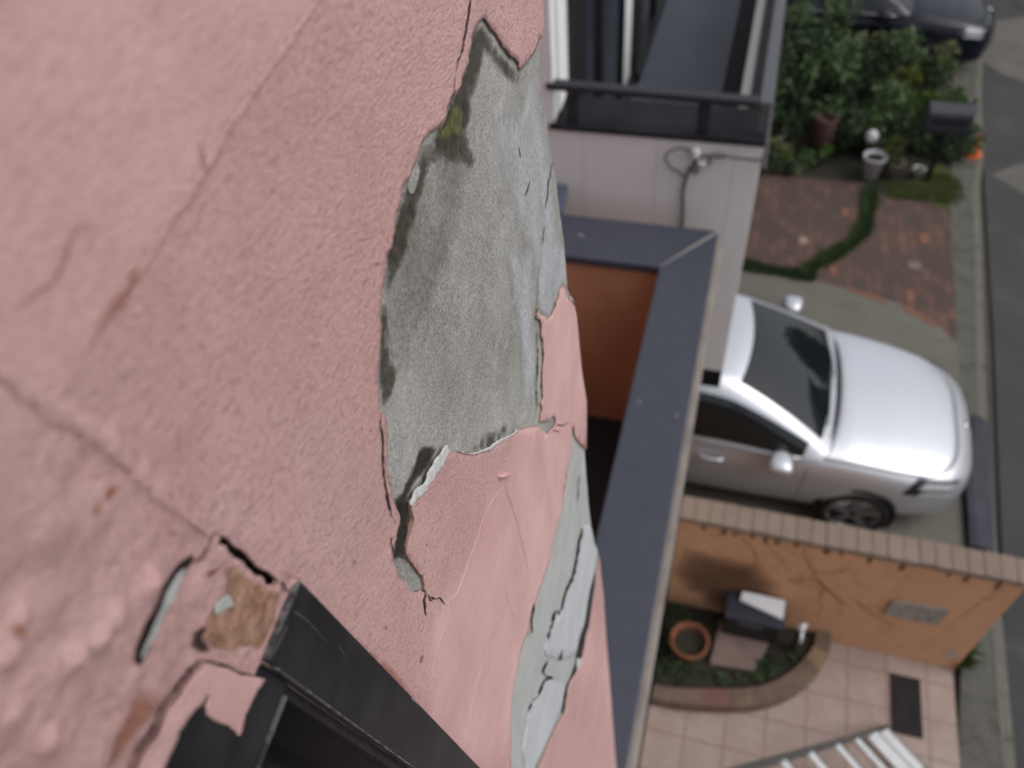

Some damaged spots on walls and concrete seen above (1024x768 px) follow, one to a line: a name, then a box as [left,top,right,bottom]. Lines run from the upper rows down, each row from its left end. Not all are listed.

crack [449,0,471,109]
peeling [378,19,574,514]
spalling [193,537,279,651]
peeling [393,532,423,592]
peeling [510,429,598,768]